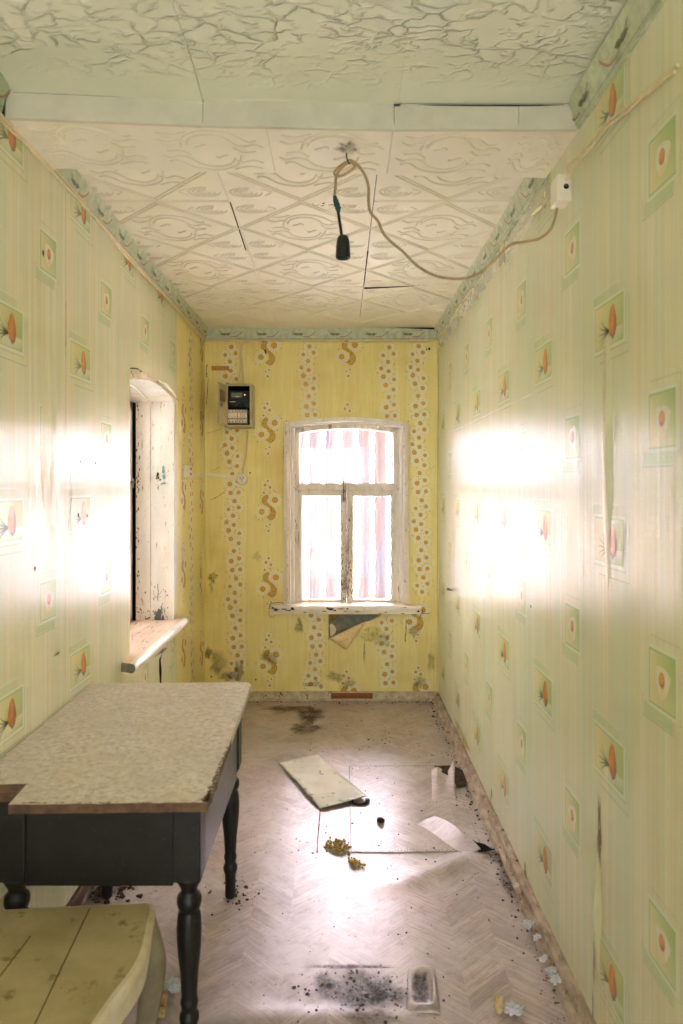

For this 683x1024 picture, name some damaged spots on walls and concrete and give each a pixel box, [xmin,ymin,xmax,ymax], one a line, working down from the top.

flaking render [322,511,387,637]